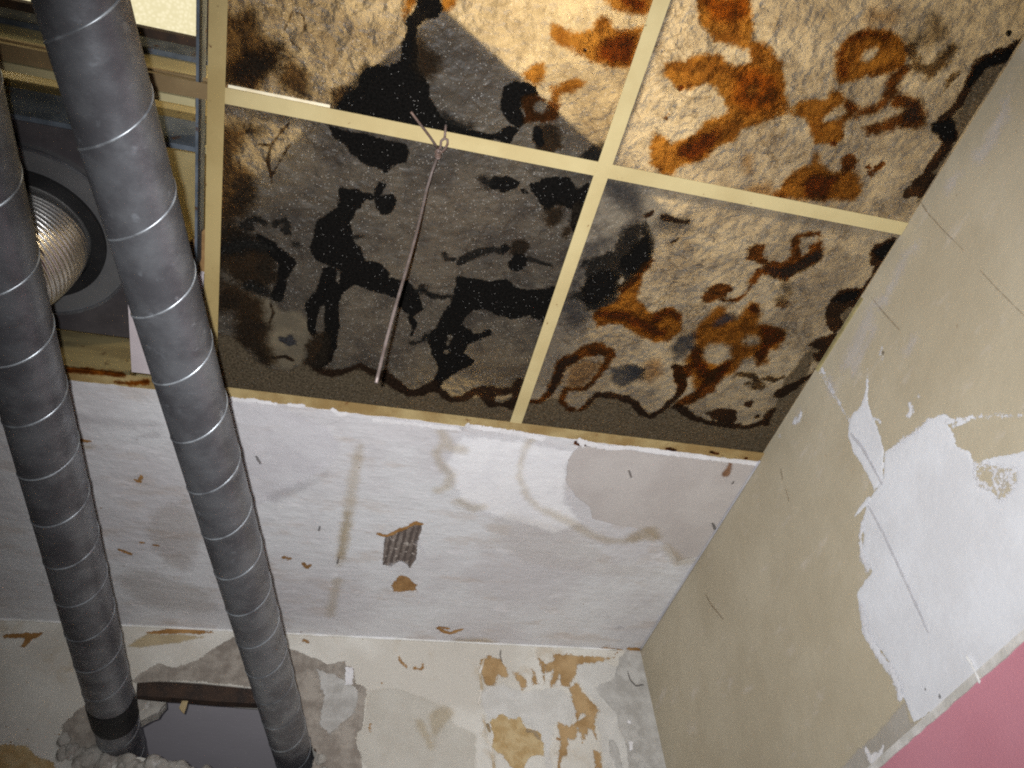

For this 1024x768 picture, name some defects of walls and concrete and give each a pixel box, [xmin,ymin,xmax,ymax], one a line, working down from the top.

damp [225,8,309,98]
damp [336,0,562,153]
damp [902,30,1024,201]
damp [217,124,897,453]
peeling [376,521,424,592]
flaking render [131,636,251,687]
flaking render [288,639,372,768]
flaking render [480,647,666,768]